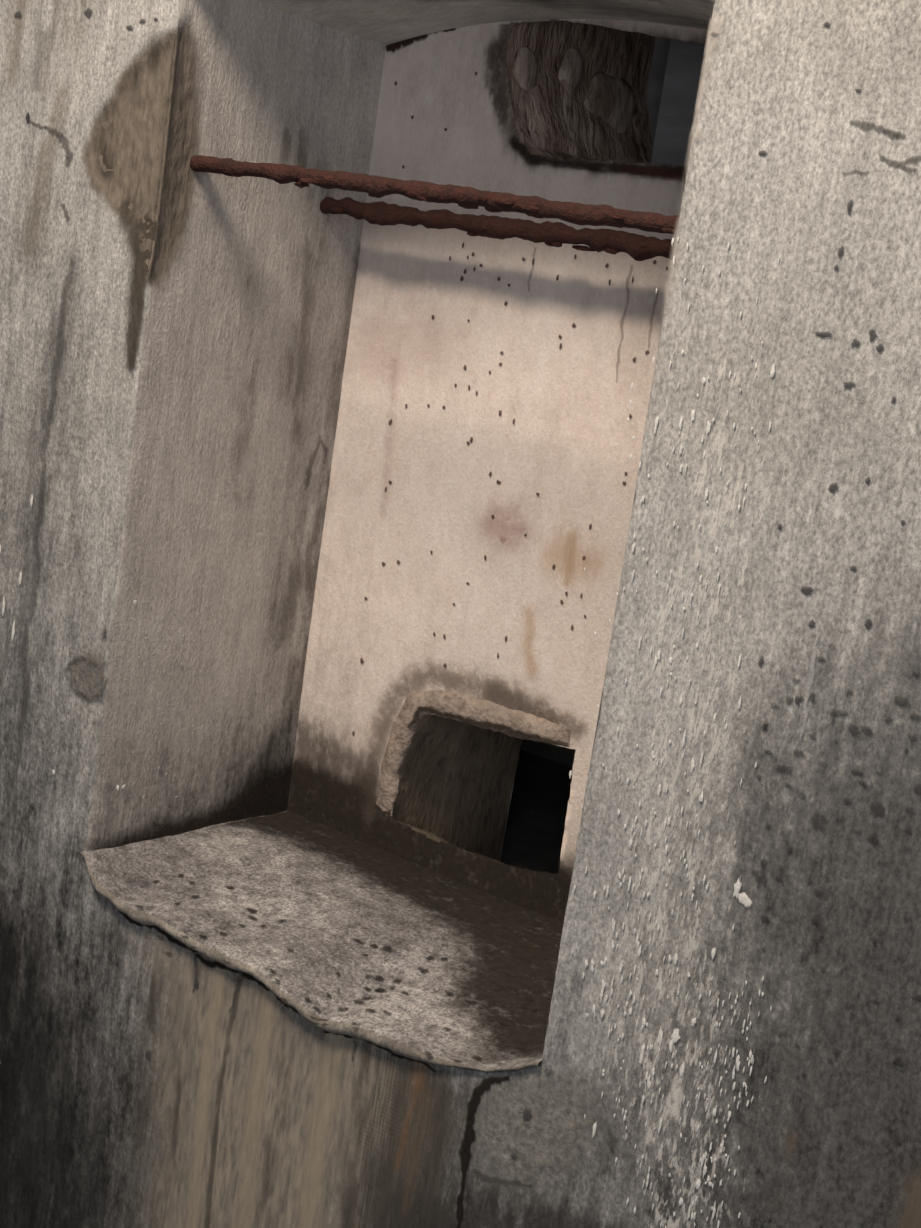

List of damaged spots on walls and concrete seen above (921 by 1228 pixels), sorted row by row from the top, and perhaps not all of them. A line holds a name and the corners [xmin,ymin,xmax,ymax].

corrosion [295,175,337,188]
corrosion [460,232,483,282]
corrosion [545,242,620,285]
damp [366,669,581,820]
damp [788,735,921,1228]
damp [0,920,101,1228]
damp [145,951,572,1228]